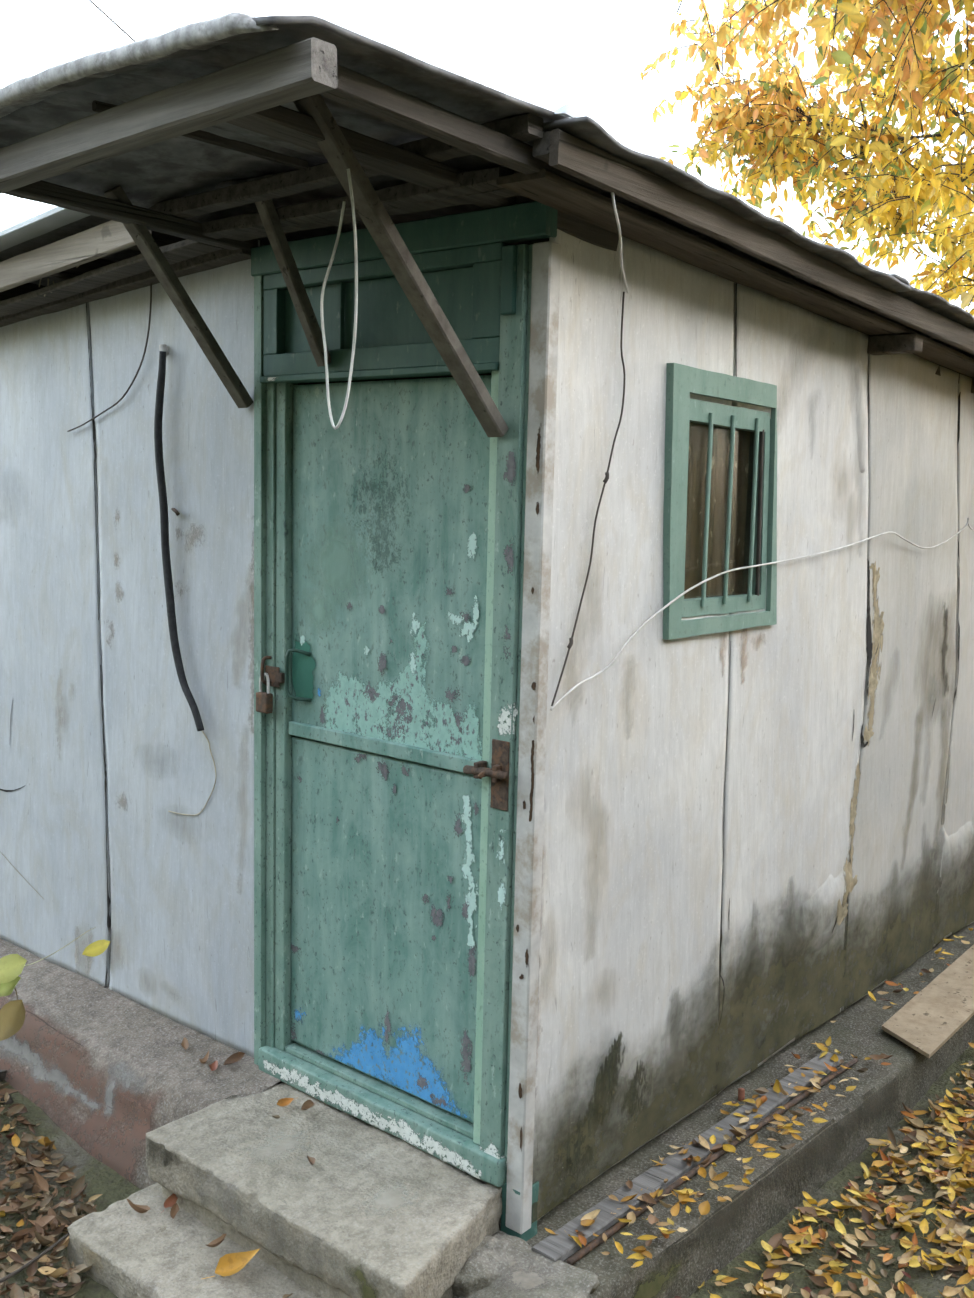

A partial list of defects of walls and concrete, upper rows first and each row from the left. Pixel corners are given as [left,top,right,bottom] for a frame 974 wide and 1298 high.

crack [955,392,963,469]
peeling [318,612,482,760]
peeling [448,595,479,666]
peeling [497,703,535,737]
crack [852,558,879,748]
crack [932,541,960,716]
peeling [523,740,534,822]
peeling [422,795,479,983]
peeling [497,883,506,911]
peeling [263,1060,507,1179]
peeling [316,1011,471,1121]
water stain [531,854,974,1224]